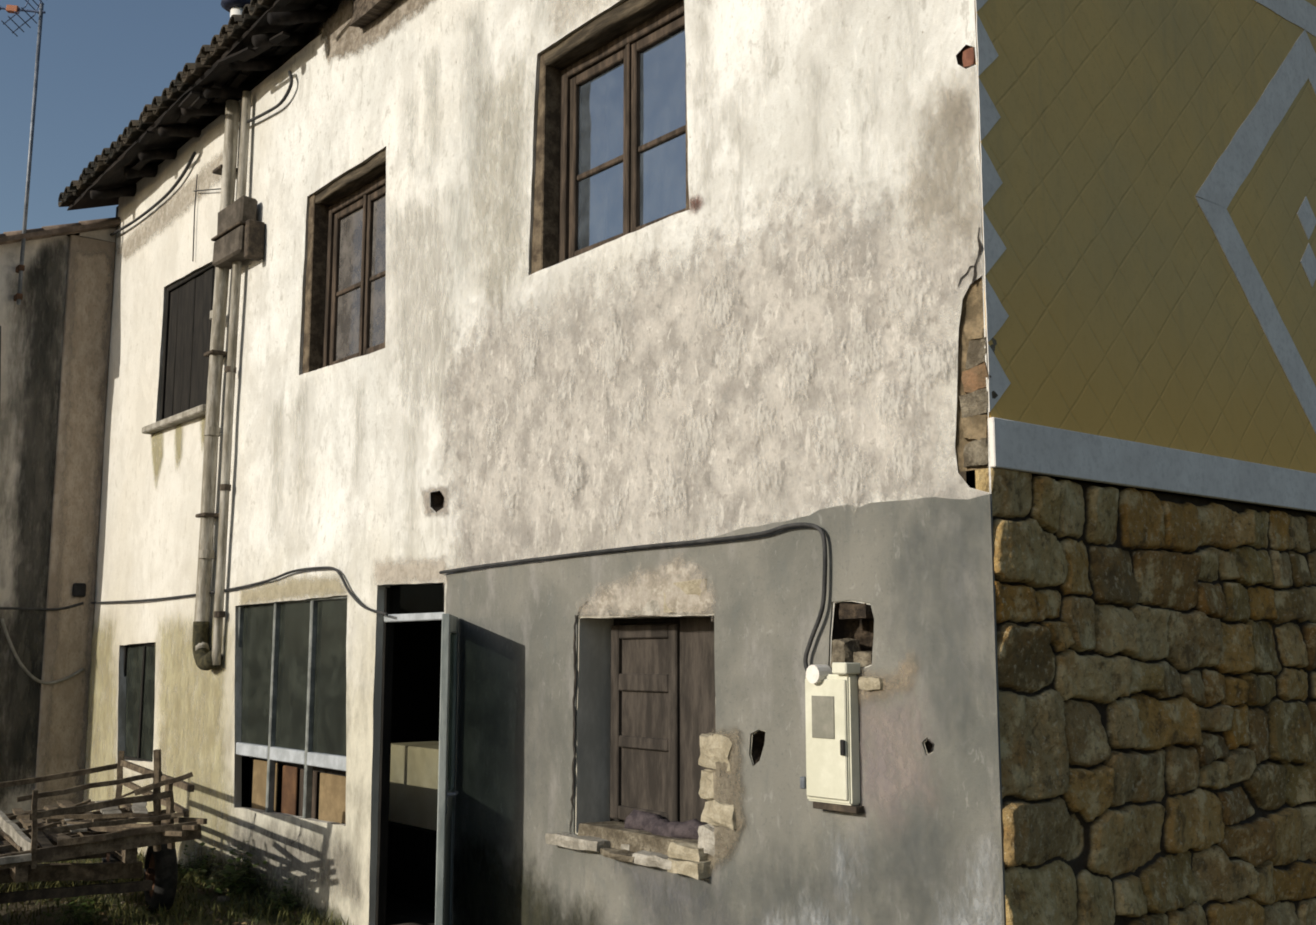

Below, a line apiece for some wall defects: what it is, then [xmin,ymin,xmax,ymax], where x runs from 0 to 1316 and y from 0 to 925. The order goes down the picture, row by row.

flaking render [956,45,978,69]
peeling [375,190,998,584]
damp [0,240,68,795]
flaking render [582,559,713,617]
spalling [830,601,914,698]
spalling [925,739,935,754]